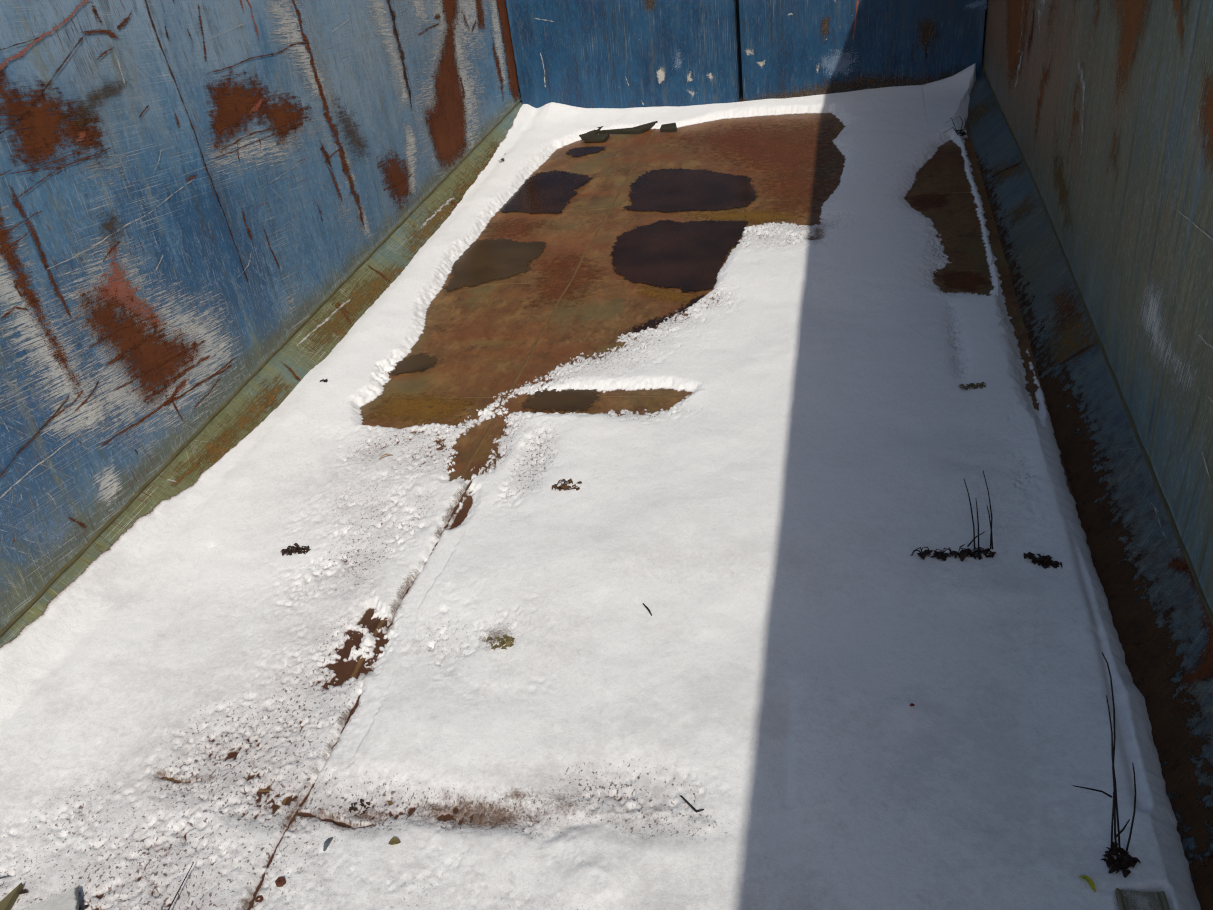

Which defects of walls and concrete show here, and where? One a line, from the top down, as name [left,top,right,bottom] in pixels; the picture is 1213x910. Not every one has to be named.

corrosion [0,70,235,446]
corrosion [206,0,521,353]
corrosion [682,208,804,223]